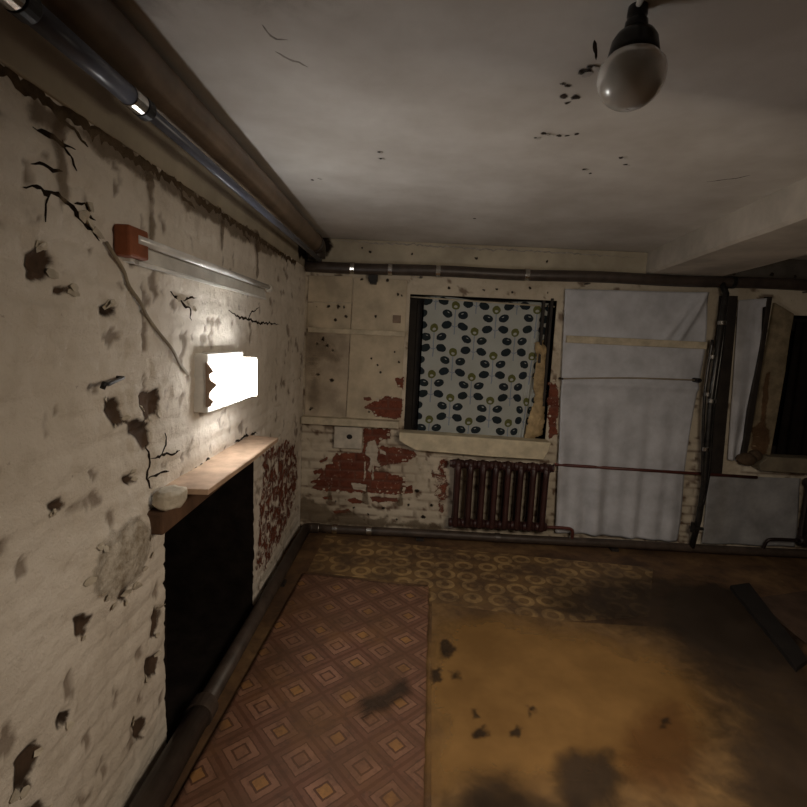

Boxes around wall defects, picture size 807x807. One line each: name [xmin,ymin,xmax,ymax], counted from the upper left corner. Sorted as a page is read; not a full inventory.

peeling [578,40,599,78]
crack [0,64,296,264]
spalling [25,240,80,297]
crack [170,291,197,320]
crack [229,308,278,325]
peeling [364,377,405,419]
peeling [547,378,561,439]
crack [145,433,180,489]
peeling [255,434,299,571]
peeling [310,428,419,515]
peeling [428,455,450,517]
spalling [10,740,53,807]